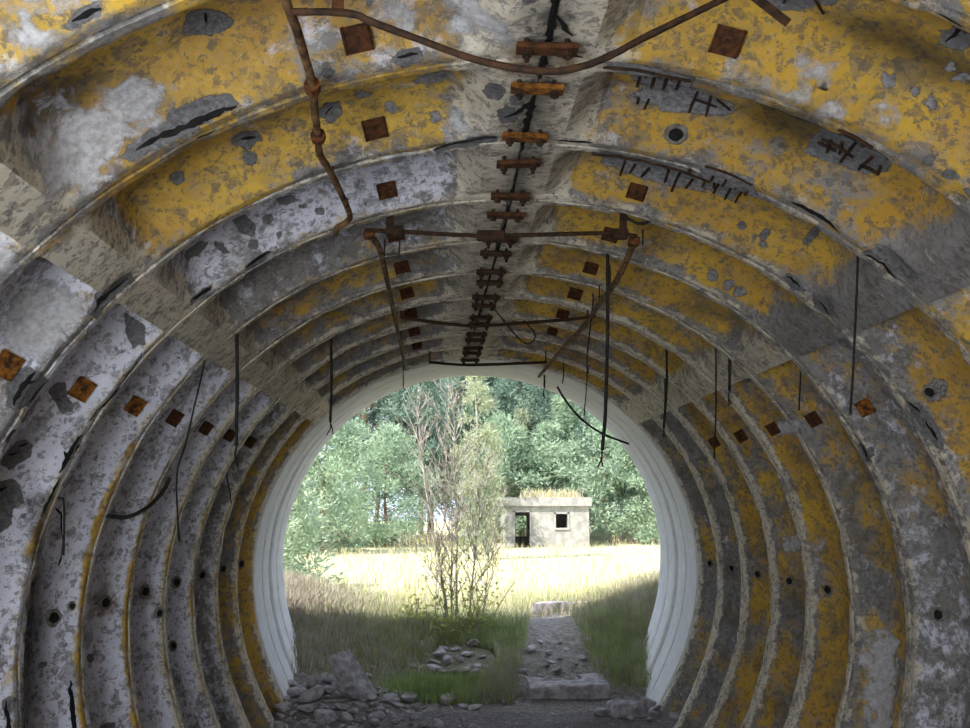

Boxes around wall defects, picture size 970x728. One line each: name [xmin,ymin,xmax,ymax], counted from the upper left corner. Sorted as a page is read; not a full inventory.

peeling [10,0,55,50]
spalling [52,0,102,31]
spalling [183,9,234,36]
spalling [767,0,837,15]
spalling [603,62,736,117]
peeling [780,56,834,104]
peeling [944,61,970,82]
peeling [22,76,238,202]
spalling [804,101,892,176]
peeling [0,274,134,413]
spalling [0,429,33,533]
crack [68,681,77,728]